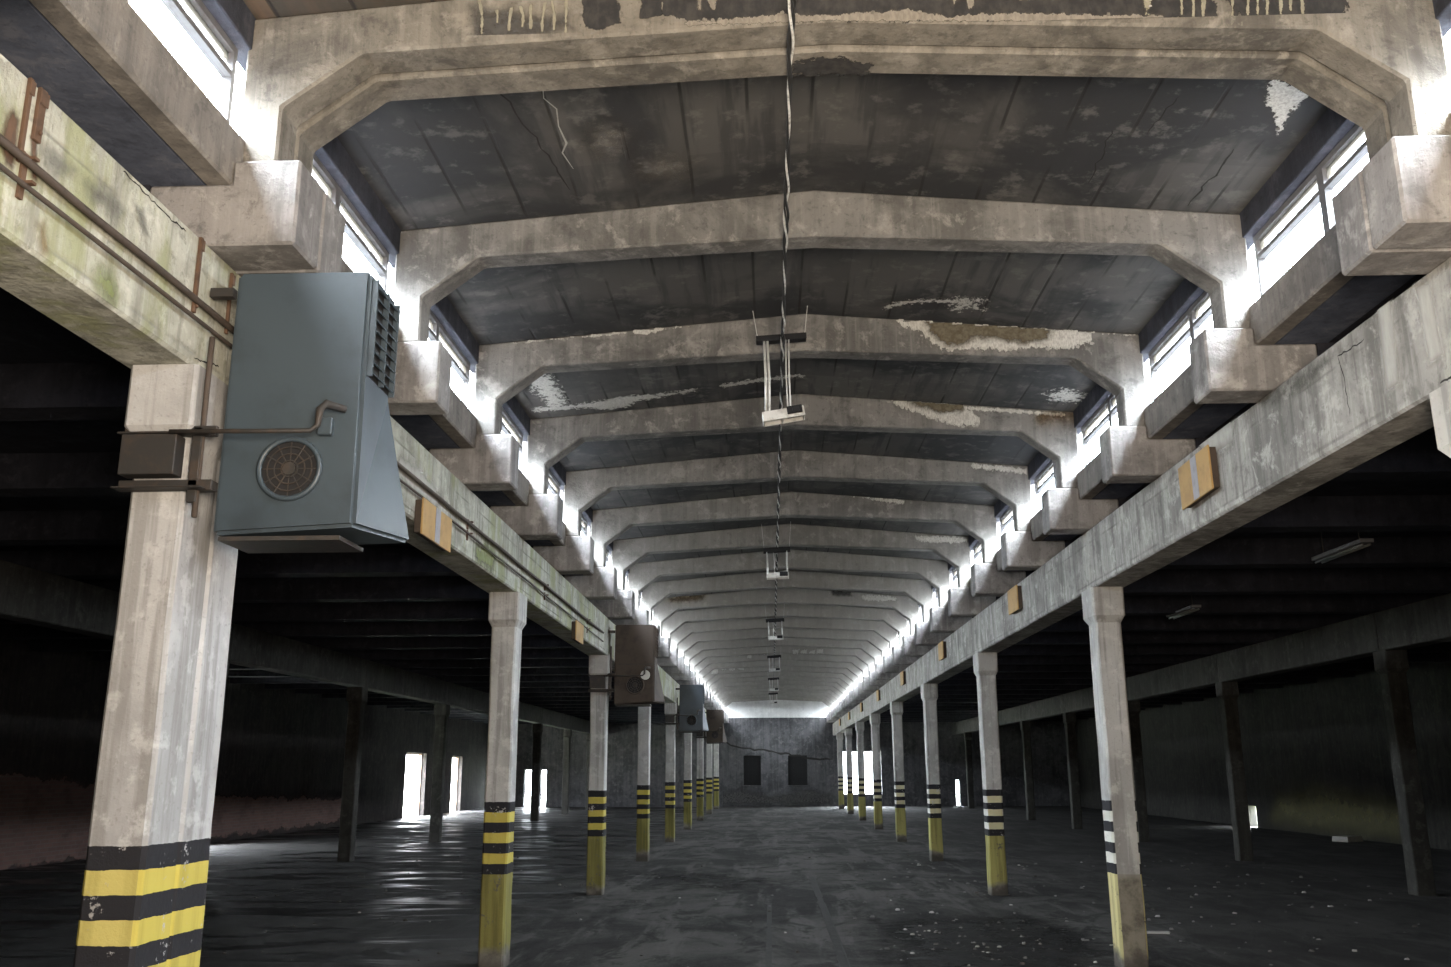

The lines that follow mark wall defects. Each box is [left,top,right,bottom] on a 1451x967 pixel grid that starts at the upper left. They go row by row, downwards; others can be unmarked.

peeling [685,0,1163,27]
spalling [1265,80,1308,135]
corrosion [2,111,37,180]
peeling [891,319,1136,353]
spalling [529,374,569,407]